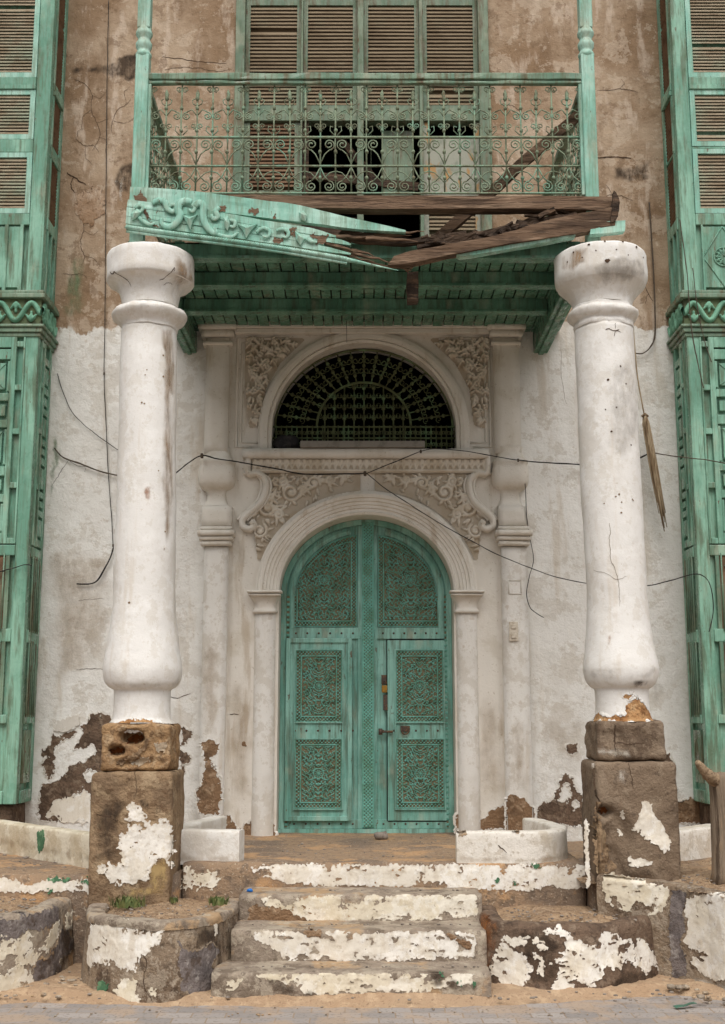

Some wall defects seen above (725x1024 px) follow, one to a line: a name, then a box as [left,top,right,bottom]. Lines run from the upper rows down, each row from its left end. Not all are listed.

damp [75,54,136,80]
crack [67,79,131,193]
damp [116,165,132,189]
crack [68,224,130,288]
crack [594,523,622,606]
peeling [592,691,653,723]
peeling [35,710,167,826]
peeling [179,725,251,835]
peeling [0,802,221,1003]
peeling [247,772,725,995]
peeling [226,978,243,991]